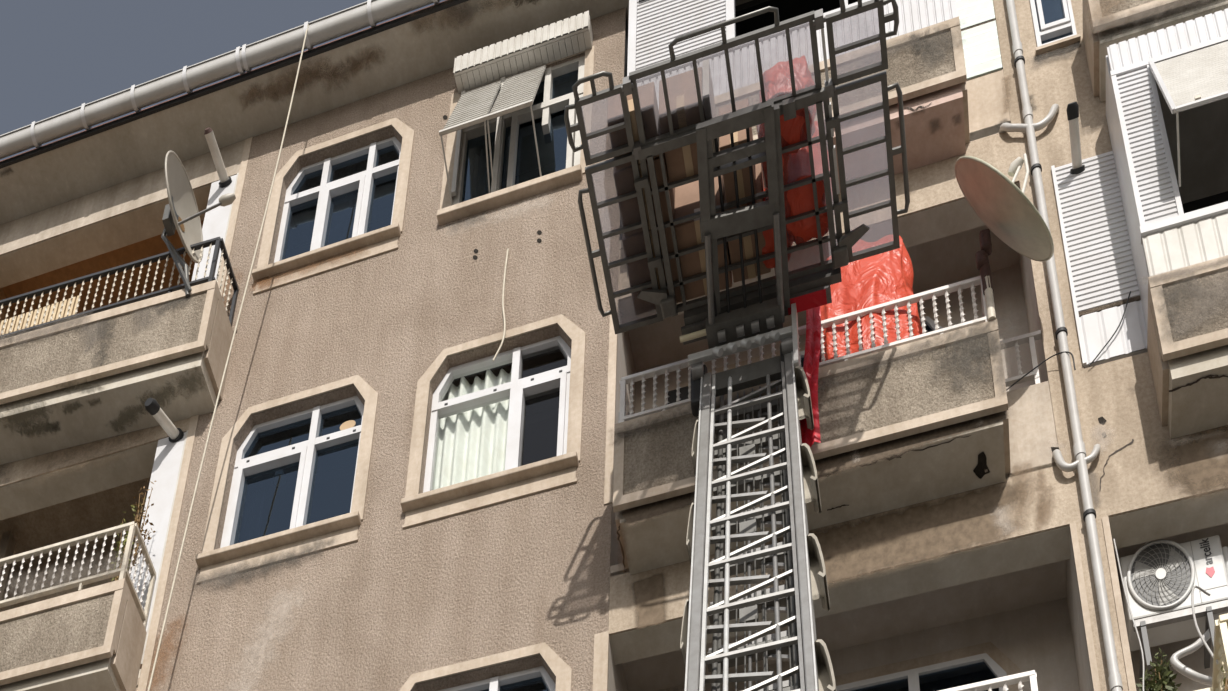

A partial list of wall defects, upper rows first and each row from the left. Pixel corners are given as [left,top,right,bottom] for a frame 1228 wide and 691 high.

crack [1169,375,1228,392]
crack [827,435,971,477]
spalling [815,410,1007,479]
crack [1100,439,1134,490]
spalling [620,492,693,525]